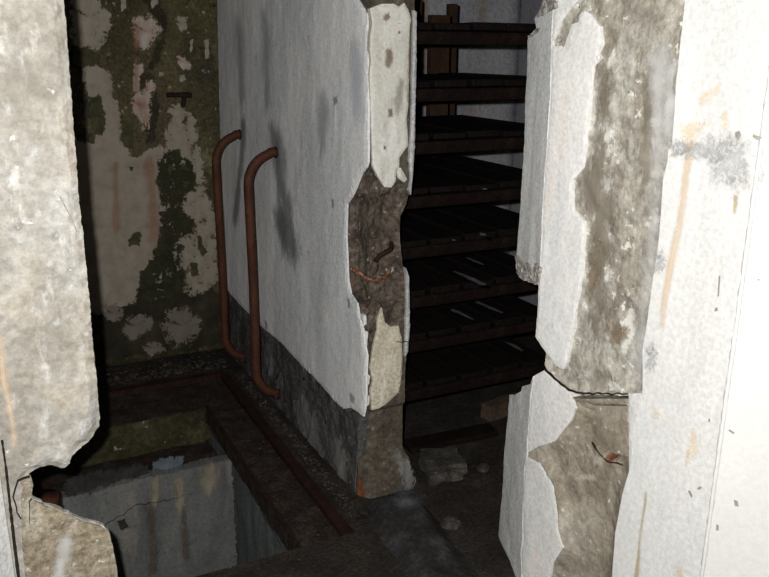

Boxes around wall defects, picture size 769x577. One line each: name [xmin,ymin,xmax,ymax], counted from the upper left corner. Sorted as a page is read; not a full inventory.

spalling [347,163,409,350]
spalling [515,255,543,285]
spalling [528,0,685,577]
corrosion [662,127,696,309]
crack [544,368,628,395]
spalling [20,475,118,577]